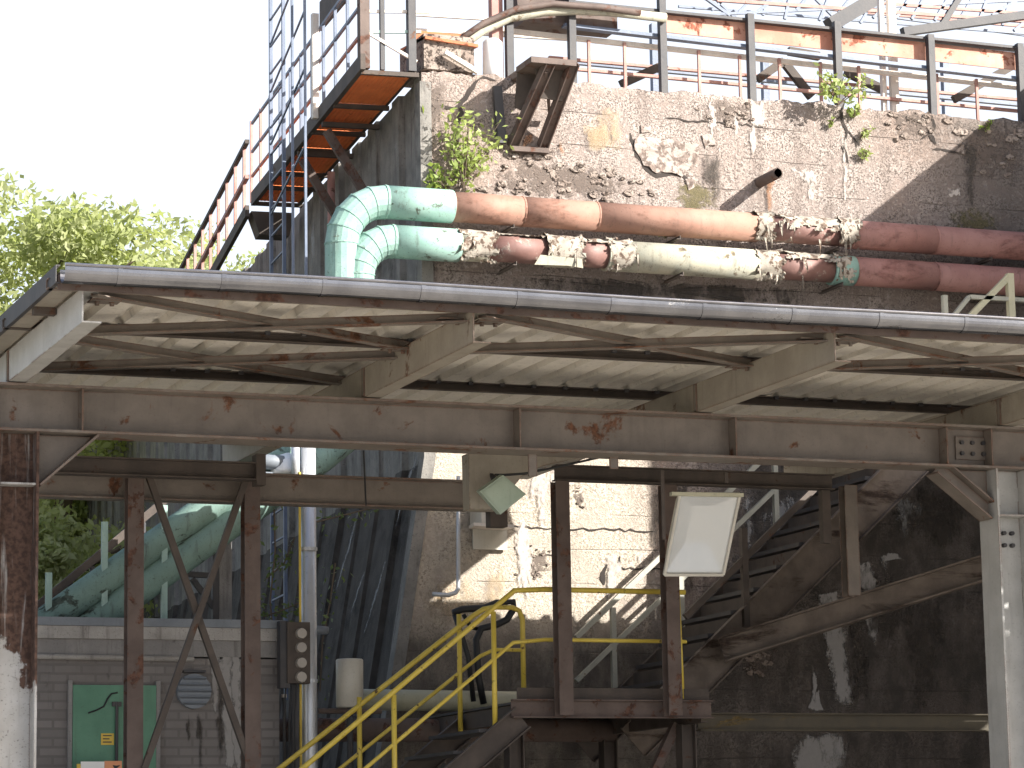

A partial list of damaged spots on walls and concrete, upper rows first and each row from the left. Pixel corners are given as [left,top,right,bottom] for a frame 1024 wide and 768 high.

spalling [476,100,755,203]
crack [514,525,653,556]
damp [860,553,900,592]
damp [818,591,838,605]
damp [823,600,945,705]
damp [792,733,846,768]